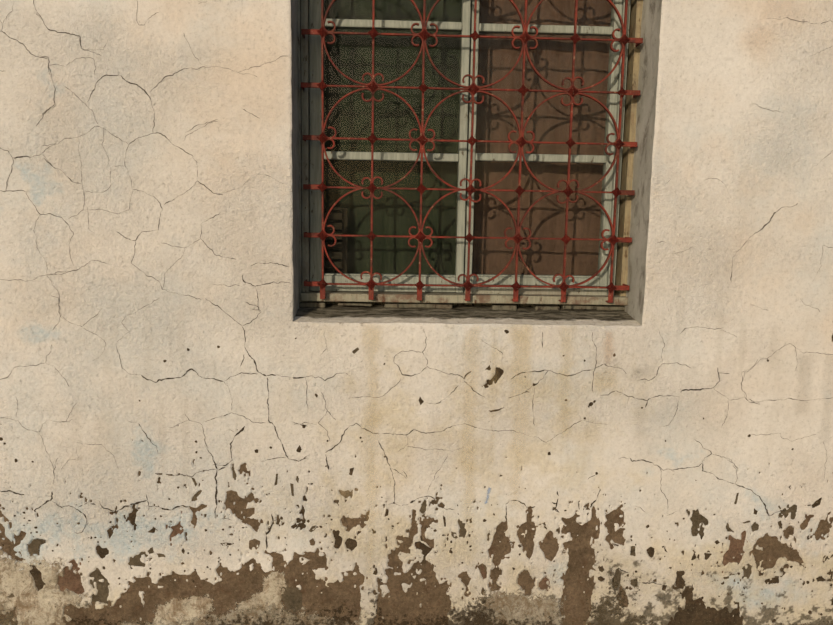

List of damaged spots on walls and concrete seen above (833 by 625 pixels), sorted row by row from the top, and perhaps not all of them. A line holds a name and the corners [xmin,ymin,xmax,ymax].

crack [0,0,601,533]
crack [730,203,798,279]
peeling [482,361,504,388]
crack [510,329,833,427]
crack [619,441,786,516]
leakage [190,604,357,625]
peeling [0,440,640,625]
leakage [371,593,563,625]
leakage [583,572,670,625]
peeling [650,497,833,625]